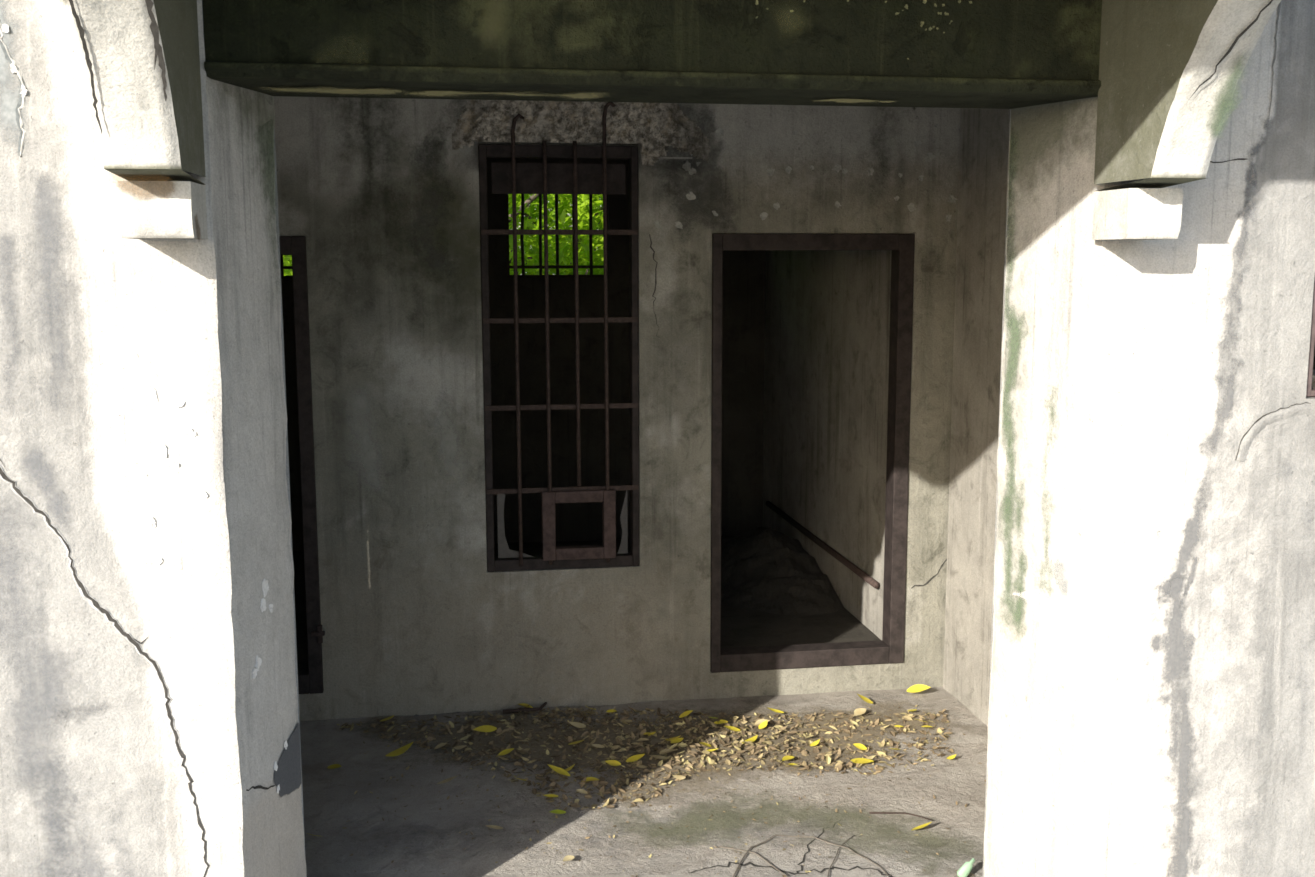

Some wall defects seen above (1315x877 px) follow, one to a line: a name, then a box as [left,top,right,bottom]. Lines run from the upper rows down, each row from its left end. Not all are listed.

crack [69,0,102,134]
crack [145,0,167,101]
spalling [268,88,711,166]
leakage [654,105,733,229]
leakage [885,0,972,33]
crack [1190,0,1281,163]
leakage [1237,121,1268,258]
leakage [1201,364,1240,452]
crack [0,460,209,877]
leakage [1152,488,1207,877]
spalling [274,723,302,797]
crack [690,820,893,877]